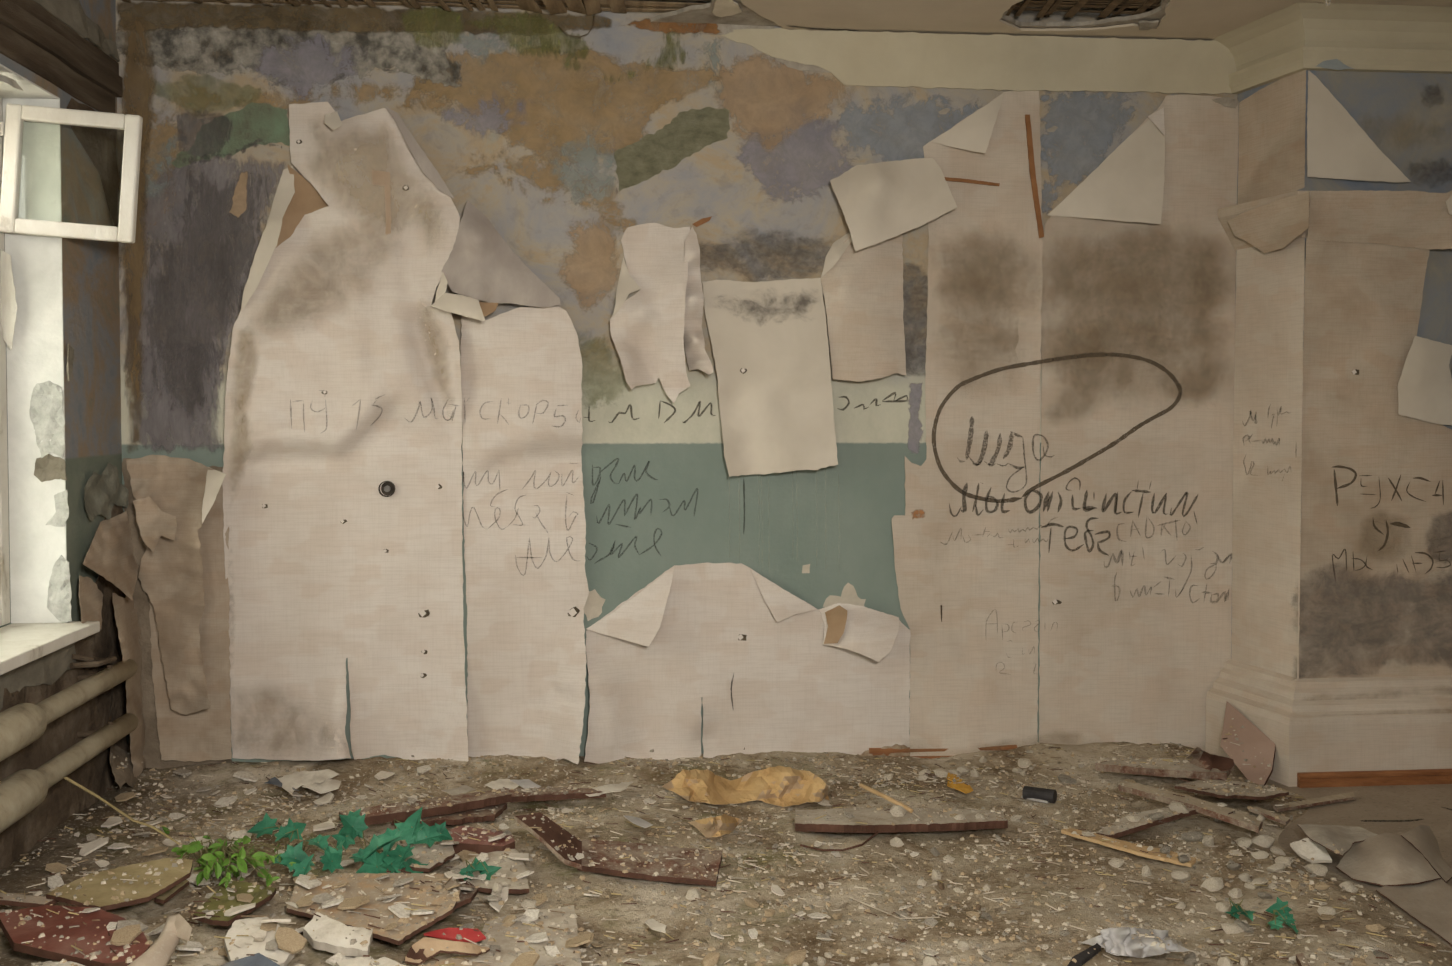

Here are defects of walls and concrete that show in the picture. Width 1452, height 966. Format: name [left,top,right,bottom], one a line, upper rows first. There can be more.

spalling [0,0,779,227]
spalling [1001,0,1170,30]
spalling [0,458,232,870]